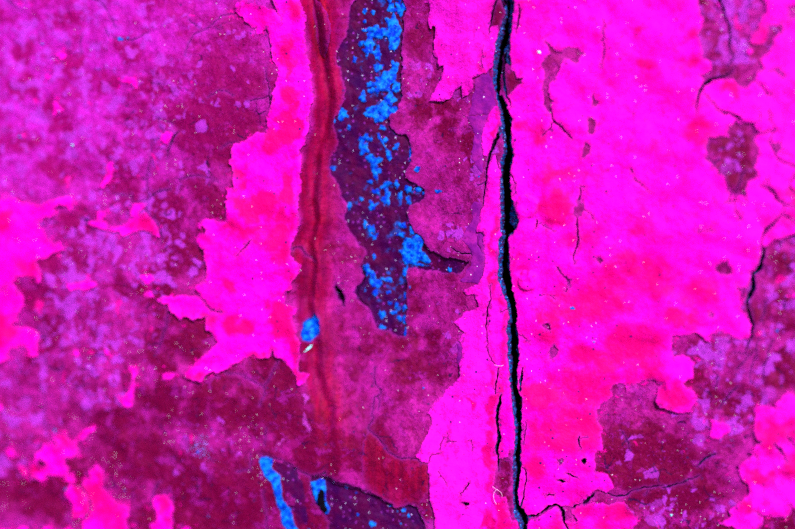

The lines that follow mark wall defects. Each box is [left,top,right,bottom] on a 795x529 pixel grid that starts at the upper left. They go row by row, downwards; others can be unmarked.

peeling [698,0,795,87]
peeling [140,0,314,386]
peeling [705,121,759,196]
crack [695,0,795,410]
peeling [0,196,75,363]
crack [451,0,716,529]
water stain [301,313,320,342]
peeling [5,426,130,529]
peeling [149,495,191,529]
peeling [275,462,308,526]
peeling [361,430,430,508]
peeling [527,501,637,529]